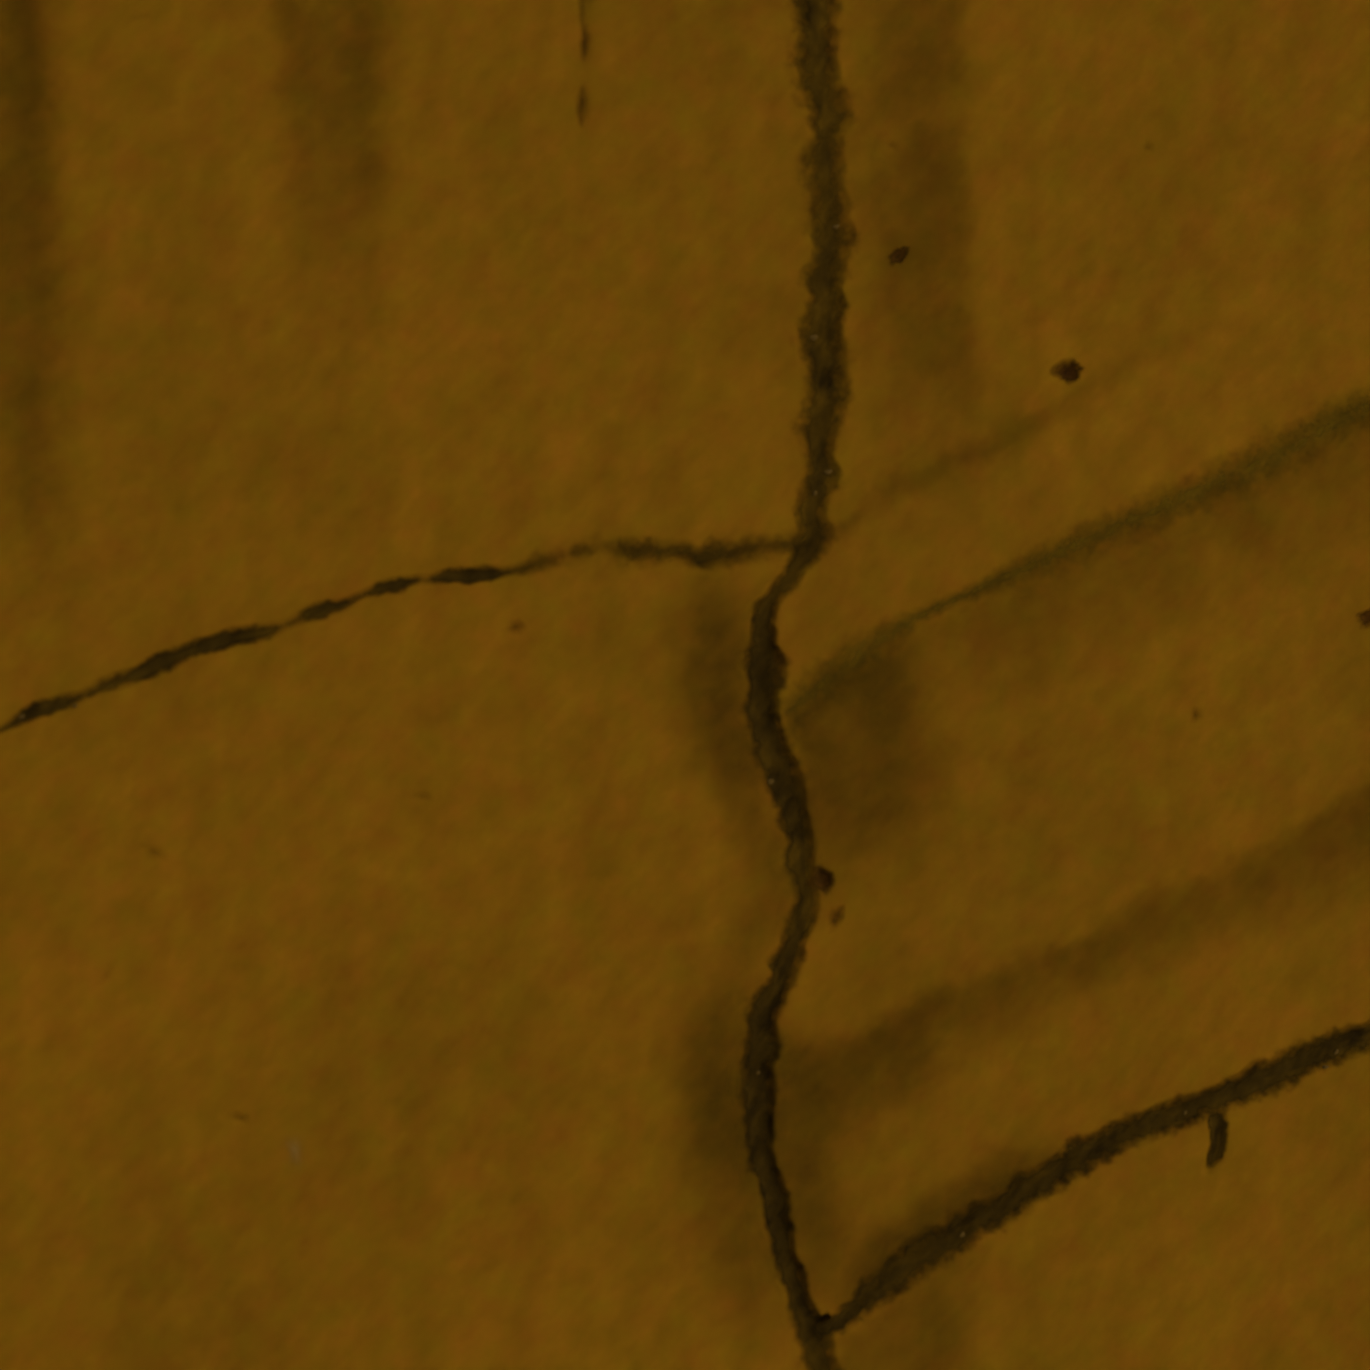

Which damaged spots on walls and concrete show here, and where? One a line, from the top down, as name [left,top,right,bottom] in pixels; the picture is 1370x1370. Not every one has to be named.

crack [0,549,577,731]
crack [617,0,1370,1370]